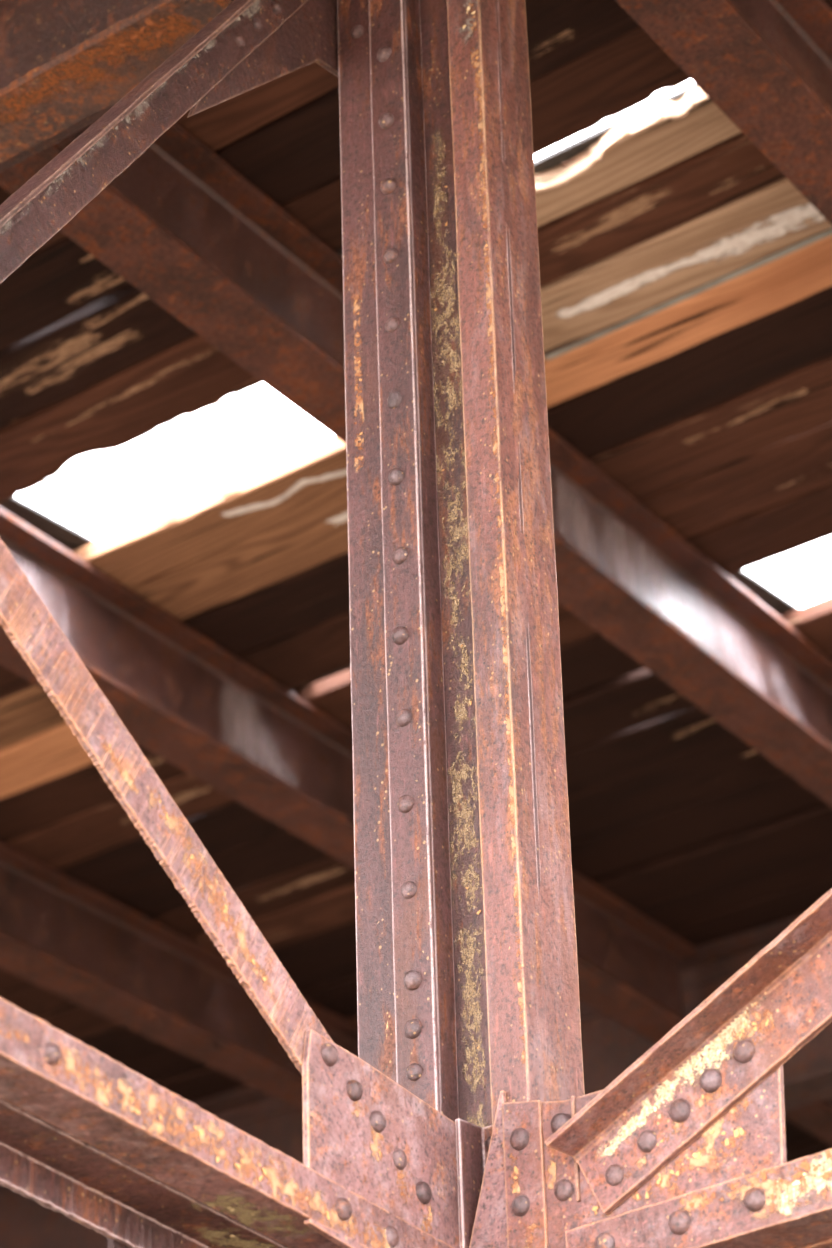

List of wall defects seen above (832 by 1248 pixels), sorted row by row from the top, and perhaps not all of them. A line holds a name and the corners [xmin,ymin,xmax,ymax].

corrosion [0,2,199,127]
corrosion [353,294,364,472]
corrosion [370,1125,384,1162]